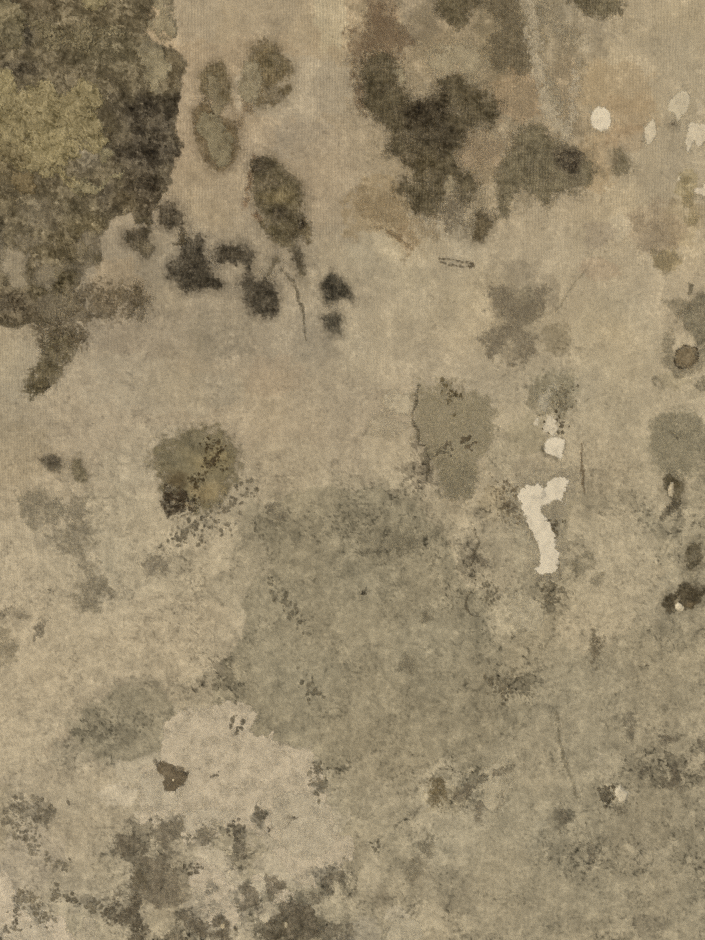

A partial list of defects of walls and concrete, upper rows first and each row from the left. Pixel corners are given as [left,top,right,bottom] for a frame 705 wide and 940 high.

mould [574,0,623,17]
water stain [342,0,594,247]
mould [614,148,630,175]
peeling [644,119,657,145]
peeling [668,91,705,152]
water stain [0,0,312,401]
mould [321,273,352,334]
peeling [510,382,575,582]